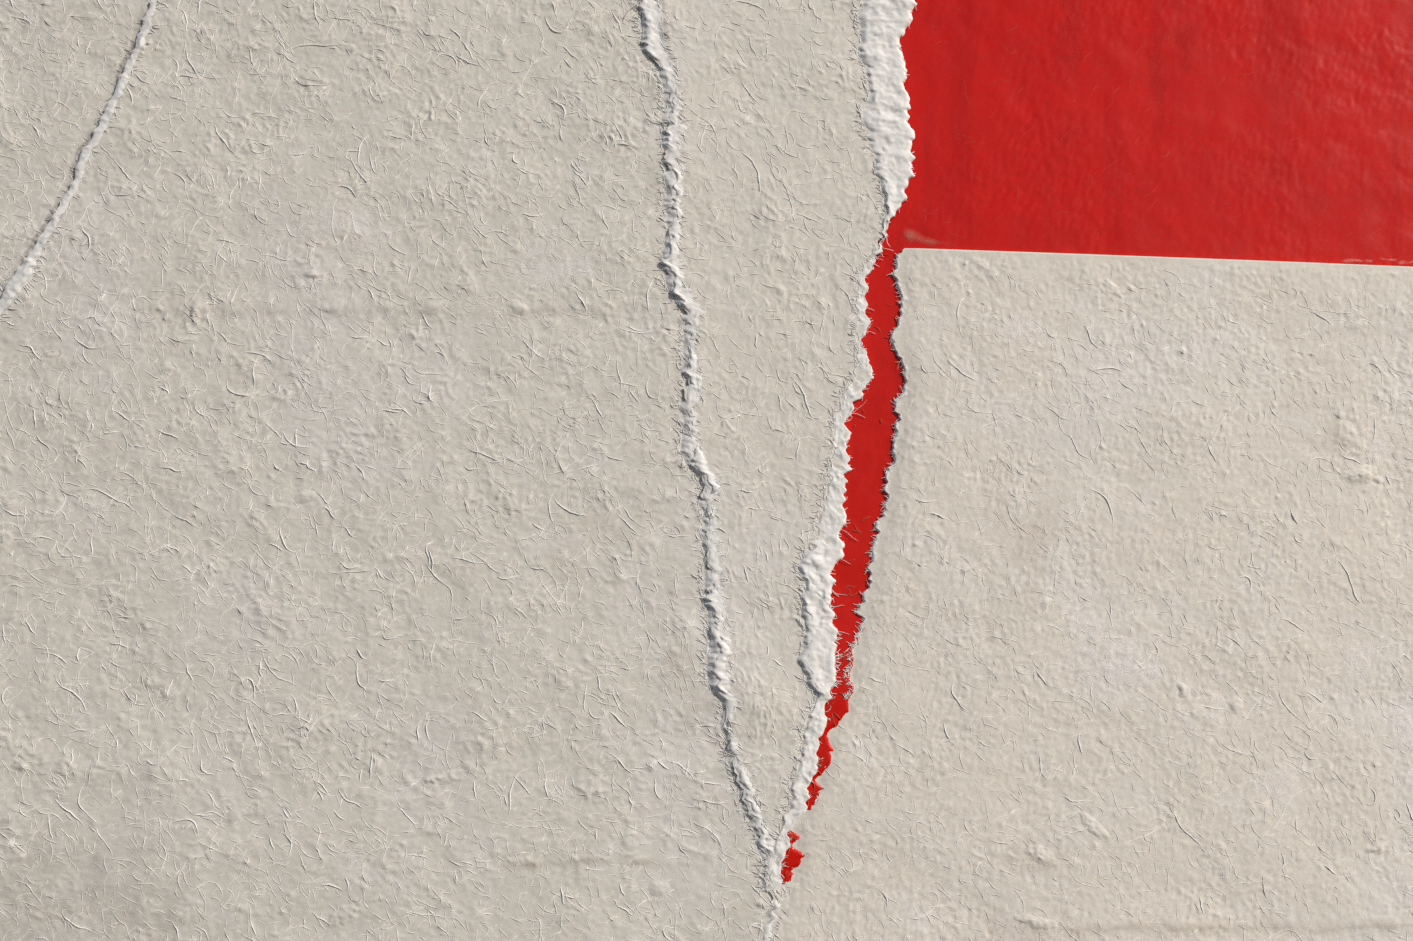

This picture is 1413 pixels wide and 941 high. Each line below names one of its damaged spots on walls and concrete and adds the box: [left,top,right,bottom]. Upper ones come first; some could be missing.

peeling [637,0,659,61]
peeling [663,87,683,148]
peeling [659,168,693,309]
peeling [8,268,34,300]
peeling [683,354,697,385]
peeling [691,446,721,494]
peeling [702,581,733,695]
peeling [739,769,777,876]